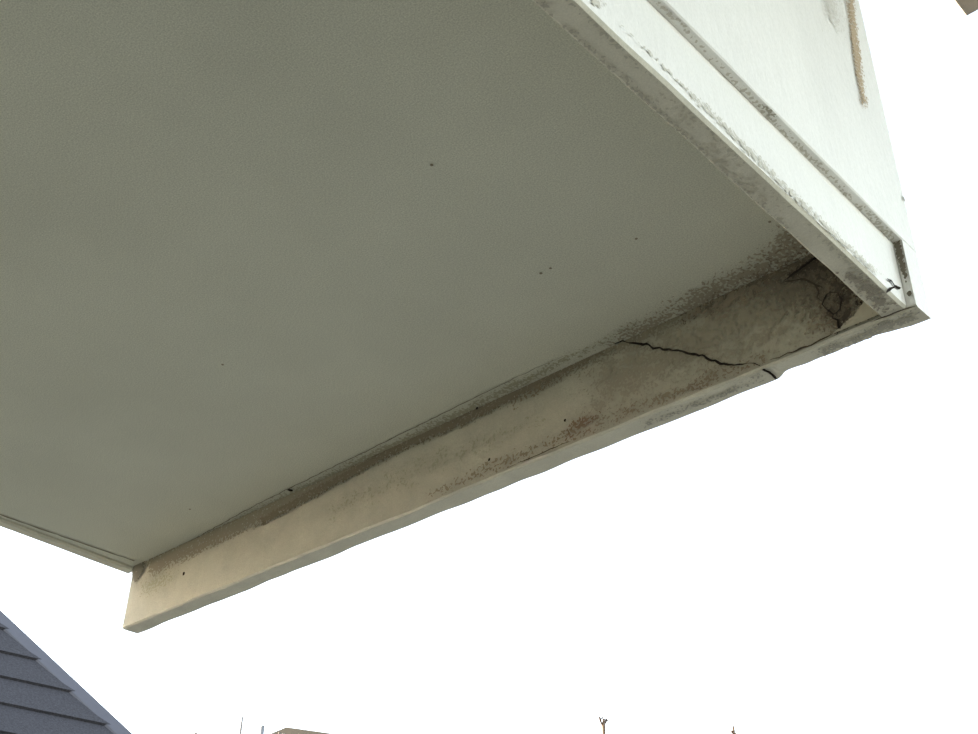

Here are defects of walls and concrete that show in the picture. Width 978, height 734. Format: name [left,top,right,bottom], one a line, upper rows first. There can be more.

damp [145,87,920,577]
crack [615,257,843,379]